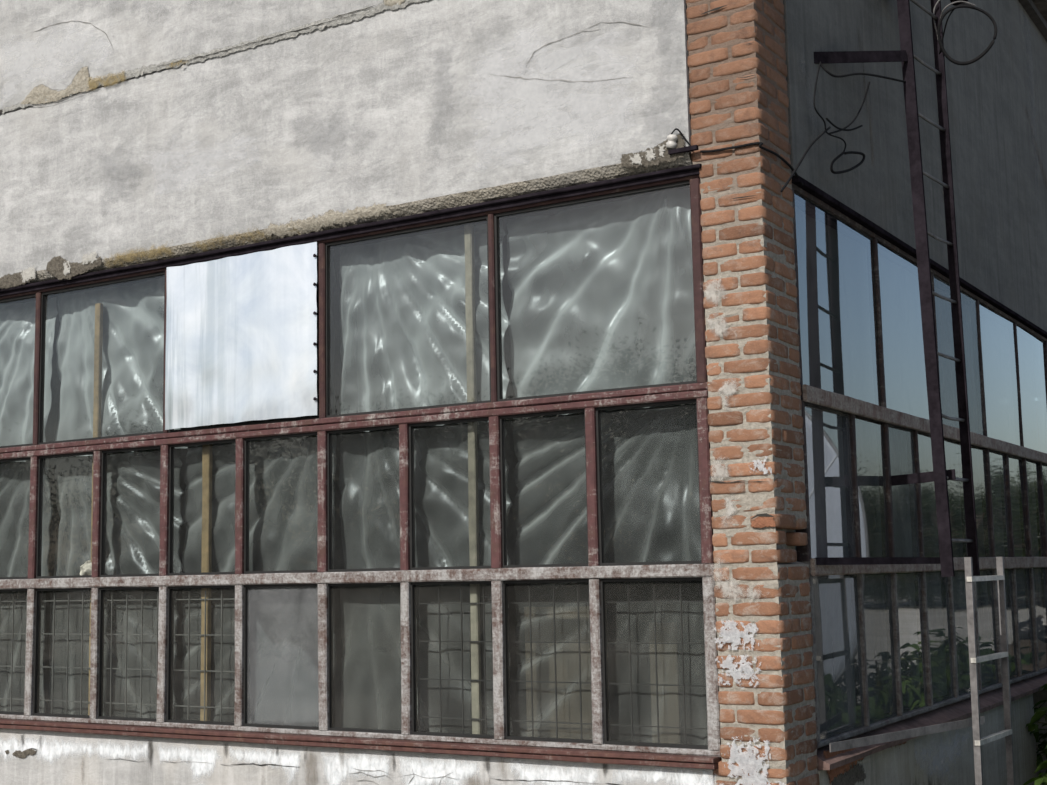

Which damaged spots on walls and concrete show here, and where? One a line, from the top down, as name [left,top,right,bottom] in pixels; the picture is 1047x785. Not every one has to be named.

crack [491,22,652,82]
spalling [21,66,92,106]
spalling [621,133,685,168]
spalling [261,203,392,238]
spalling [0,251,102,289]
peeling [714,620,762,689]
damp [0,738,299,778]
damp [324,754,489,785]
crack [496,777,619,785]
damp [512,762,714,785]
peeling [721,736,786,785]